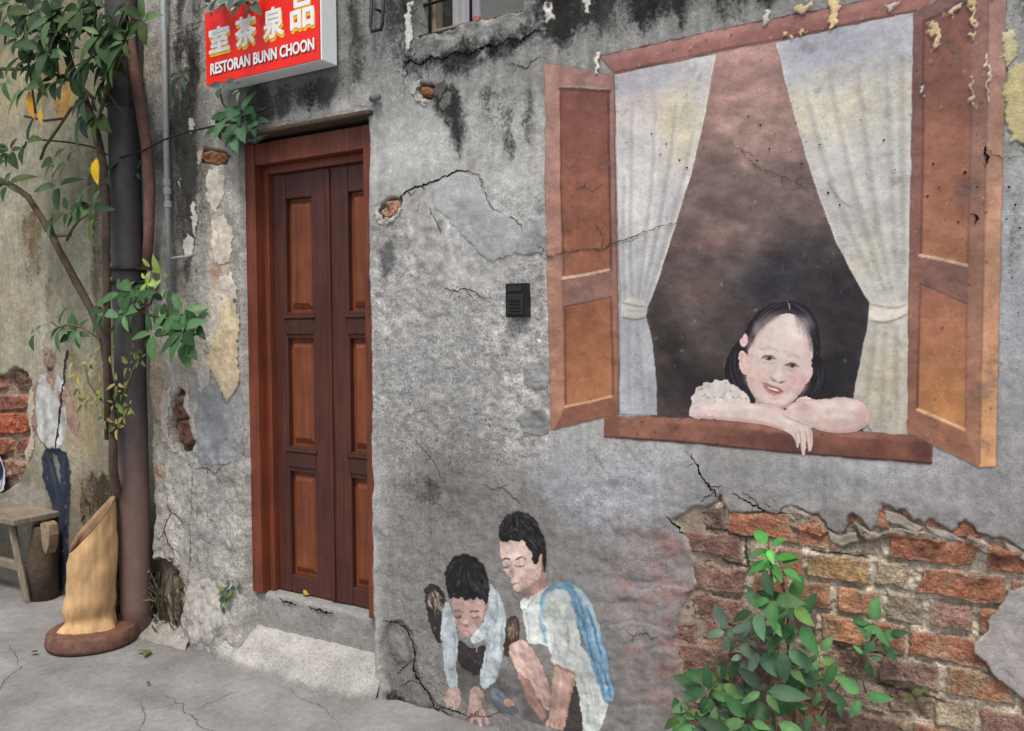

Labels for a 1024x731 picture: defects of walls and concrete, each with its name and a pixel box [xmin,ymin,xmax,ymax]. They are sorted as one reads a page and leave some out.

damp [170,0,205,279]
damp [346,0,365,82]
crack [398,30,547,80]
damp [385,0,689,158]
peeling [927,0,978,49]
peeling [968,29,1024,151]
spalling [373,199,403,225]
crack [400,169,677,258]
peeling [159,150,240,453]
crack [684,450,777,512]
spalling [677,495,1024,731]
crack [383,620,500,719]